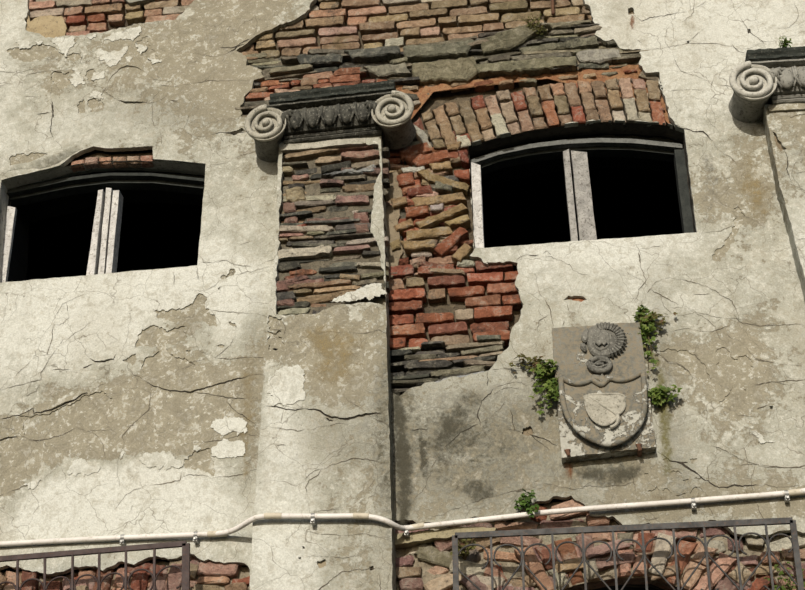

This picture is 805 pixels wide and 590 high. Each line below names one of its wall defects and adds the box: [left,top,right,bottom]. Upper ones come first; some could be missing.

crack [0,48,97,148]
spalling [7,0,194,114]
crack [95,60,229,147]
crack [633,0,799,161]
spalling [17,150,154,188]
spalling [235,0,683,396]
crack [626,244,804,386]
crack [0,295,386,509]
peeling [140,416,248,476]
crack [660,446,805,519]
spalling [0,556,250,590]
spalling [395,499,805,590]